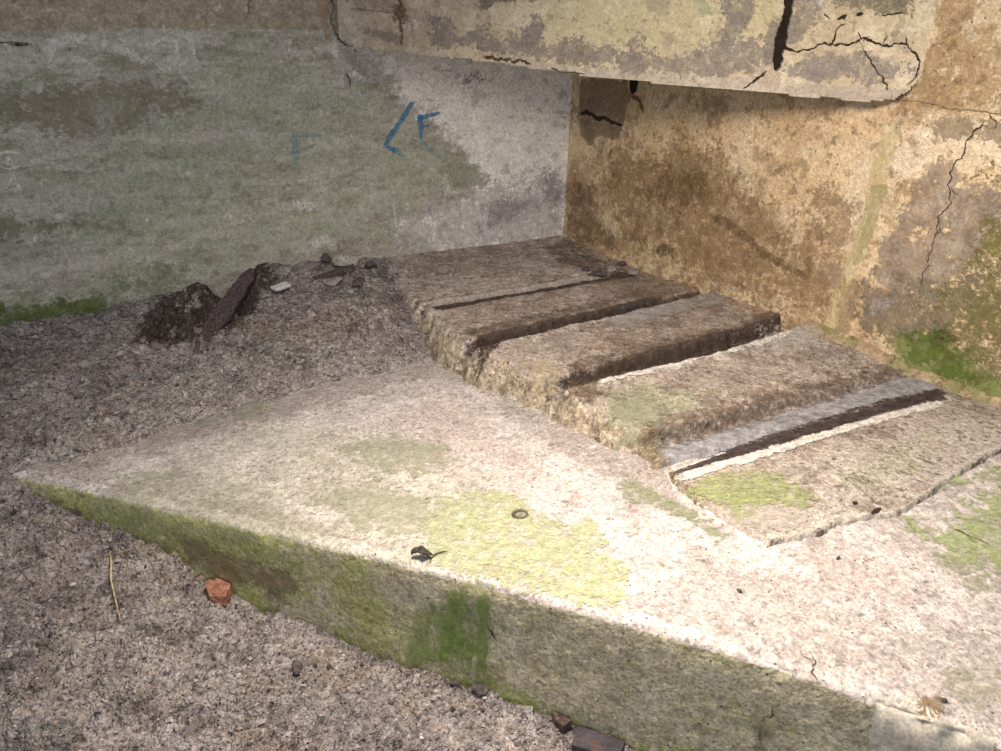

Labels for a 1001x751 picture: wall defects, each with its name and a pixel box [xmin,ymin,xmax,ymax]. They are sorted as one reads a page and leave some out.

crack [743,0,1001,288]